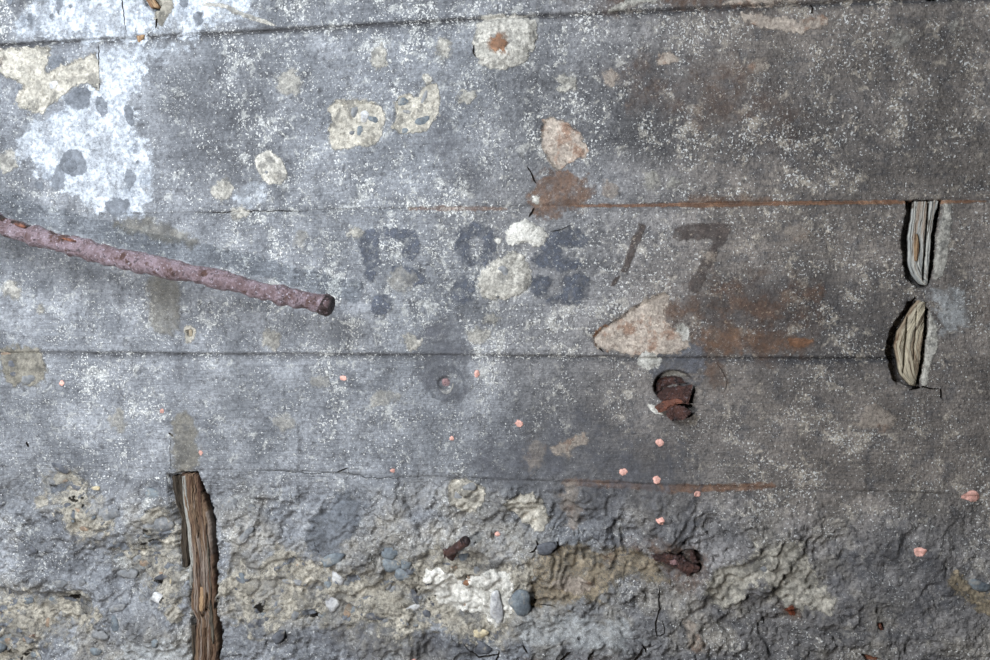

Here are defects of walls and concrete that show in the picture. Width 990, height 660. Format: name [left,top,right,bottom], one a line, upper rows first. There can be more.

peeling [34,149,87,191]
peeling [105,160,139,217]
corrosion [528,170,912,219]
corrosion [0,213,335,317]
crack [531,576,555,608]
crack [451,631,499,660]
crack [634,585,665,660]